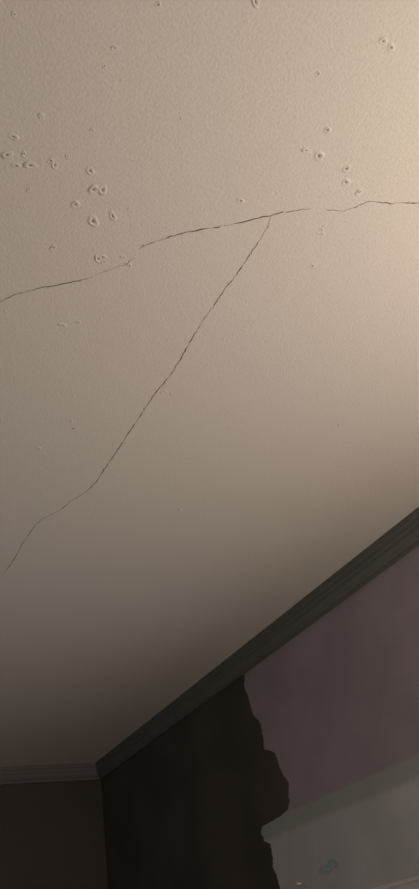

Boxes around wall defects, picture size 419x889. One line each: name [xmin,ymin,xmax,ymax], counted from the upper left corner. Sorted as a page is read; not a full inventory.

crack [327,201,419,211]
crack [0,209,303,569]